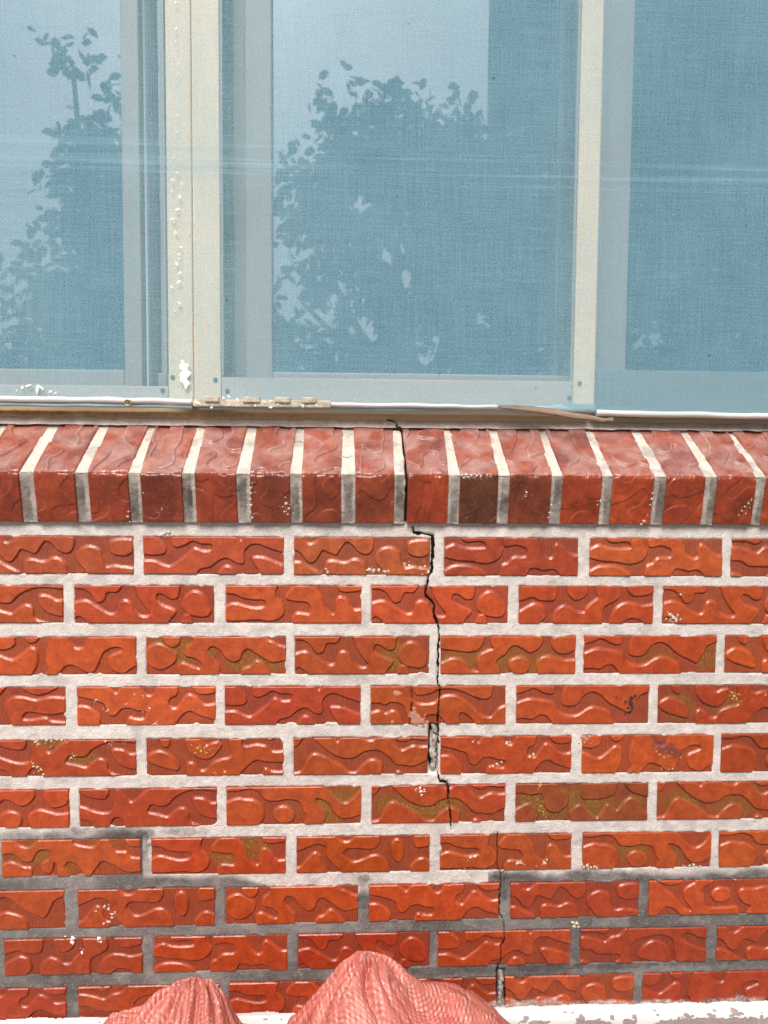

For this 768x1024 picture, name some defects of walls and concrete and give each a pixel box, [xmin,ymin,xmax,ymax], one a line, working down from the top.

crack [387,419,452,829]
crack [496,832,506,1007]